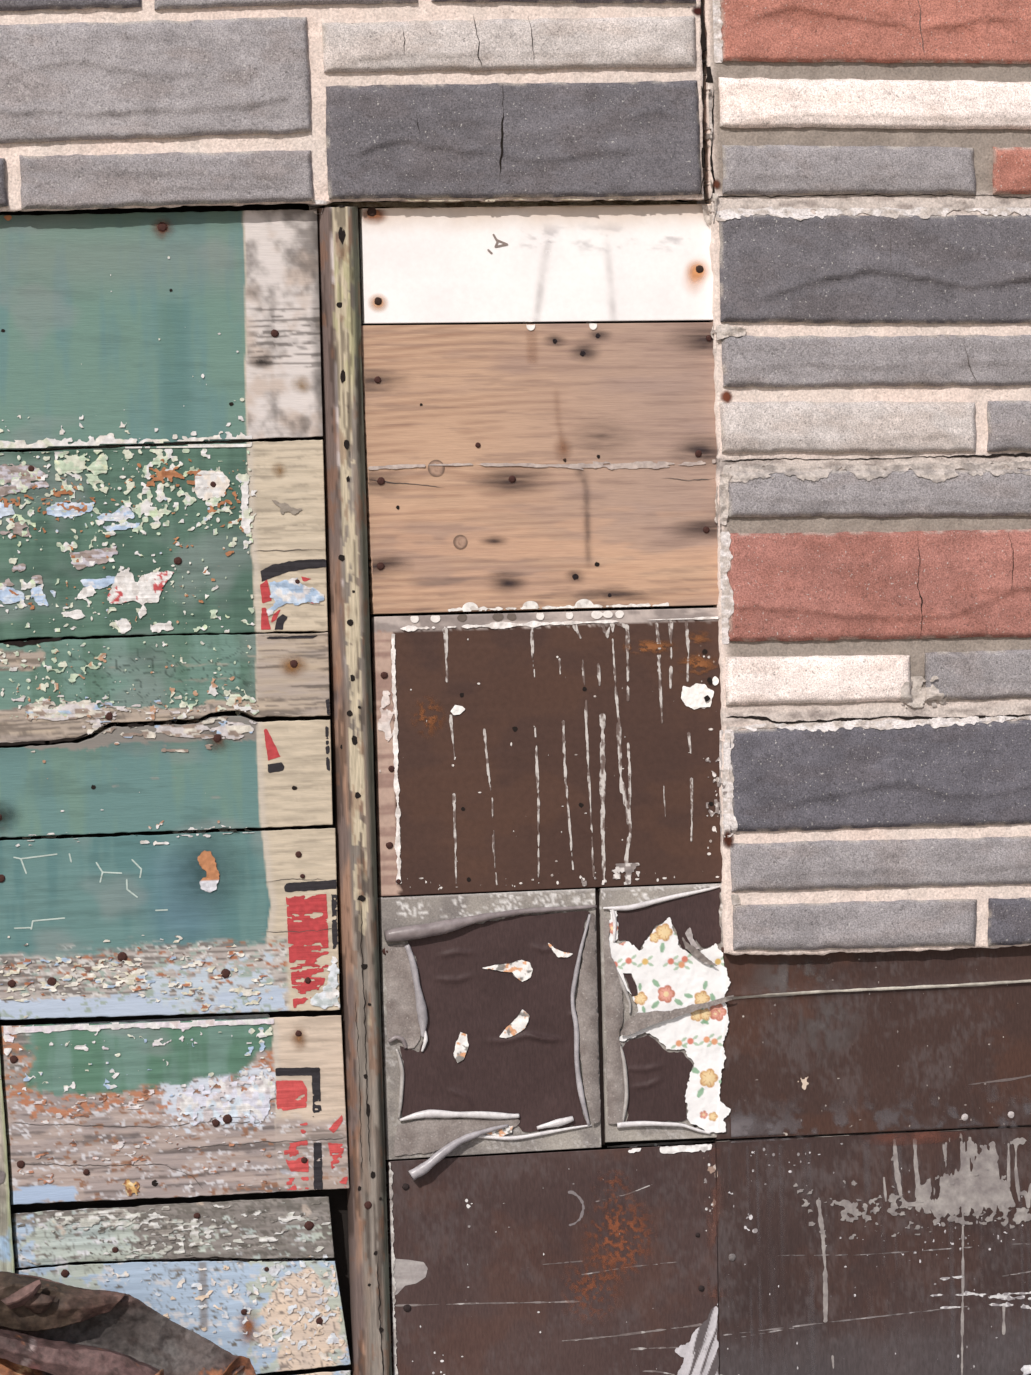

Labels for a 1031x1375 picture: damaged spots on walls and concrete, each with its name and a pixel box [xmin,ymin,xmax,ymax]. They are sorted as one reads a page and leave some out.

crack [422,16,506,209]
crack [698,2,1029,201]
peeling [0,398,324,752]
spalling [368,459,1031,644]
crack [0,721,193,746]
peeling [378,620,618,890]
peeling [681,645,719,710]
spalling [688,676,1031,855]
peeling [579,863,640,886]
peeling [0,935,345,1361]
rust [582,1208,642,1299]
peeling [750,1104,1031,1267]